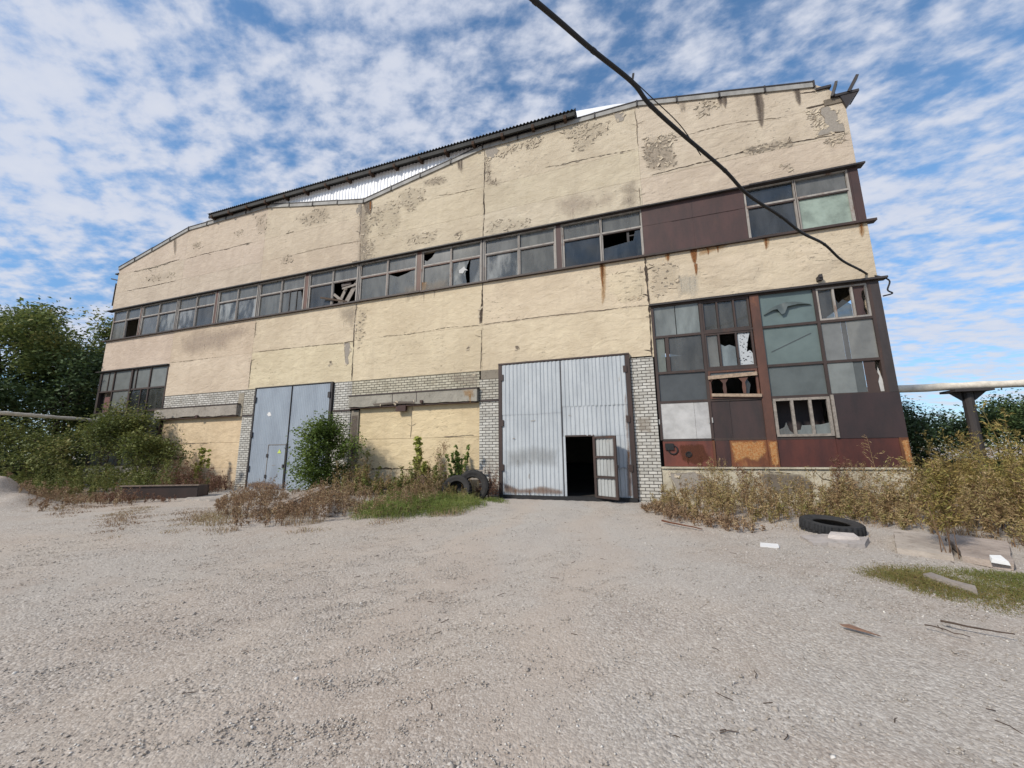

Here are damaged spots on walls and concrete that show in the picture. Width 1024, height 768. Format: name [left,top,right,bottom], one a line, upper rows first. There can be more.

spalling [485,137,544,185]
peeling [560,111,625,152]
peeling [641,132,678,169]
crack [548,111,781,167]
crack [633,131,845,203]
spalling [805,106,848,147]
corrosion [690,246,719,274]
corrosion [681,445,708,465]
corrosion [731,441,778,465]